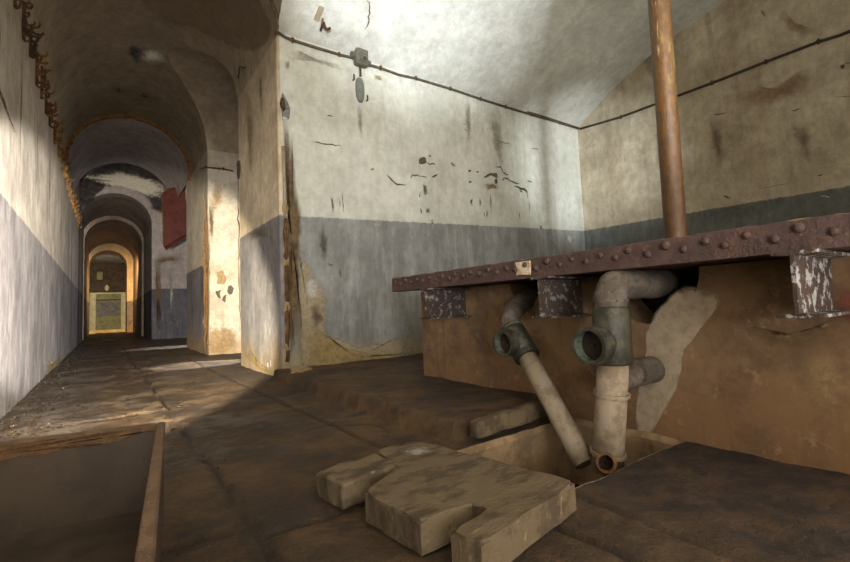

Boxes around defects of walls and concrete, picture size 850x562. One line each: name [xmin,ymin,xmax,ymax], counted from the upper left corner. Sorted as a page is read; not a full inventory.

spalling [215,271,234,302]
peeling [298,259,326,367]
peeling [334,338,410,357]